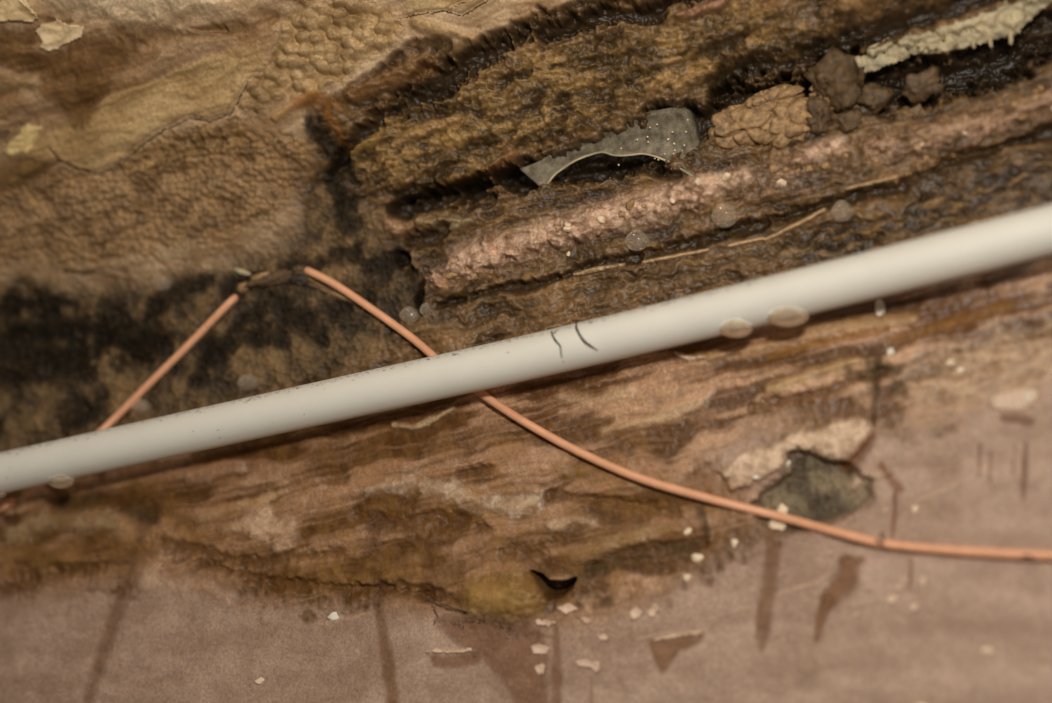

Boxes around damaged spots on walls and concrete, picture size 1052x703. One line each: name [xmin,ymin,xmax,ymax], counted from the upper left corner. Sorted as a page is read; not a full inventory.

peeling [0,0,84,52]
crack [10,84,248,188]
peeling [6,43,266,189]
spalling [308,0,1052,286]
damp [0,274,215,388]
damp [190,115,412,386]
damp [410,283,425,313]
damp [842,349,900,471]
spalling [718,415,873,535]
damp [757,530,777,648]
damp [814,557,864,641]
damp [432,615,561,703]